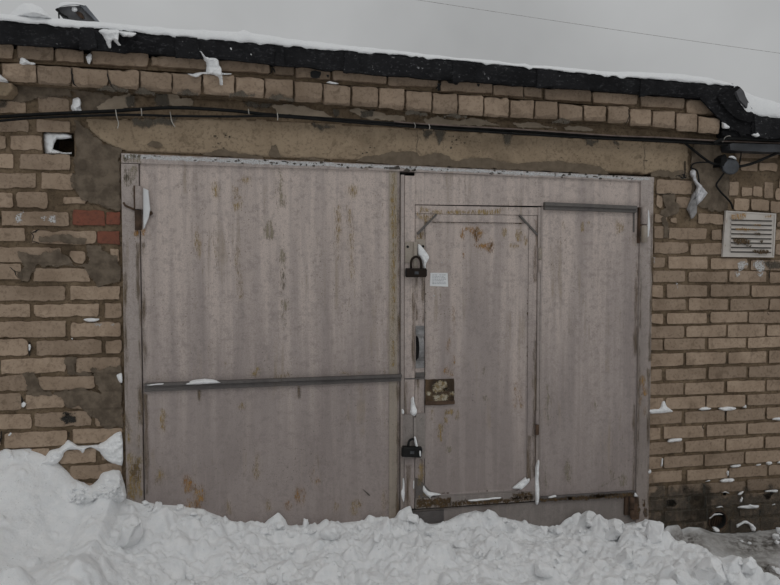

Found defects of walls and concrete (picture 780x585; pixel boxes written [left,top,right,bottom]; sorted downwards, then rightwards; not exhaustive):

peeling [163,89,198,106]
peeling [269,94,332,117]
peeling [349,108,405,121]
peeling [424,114,499,126]
peeling [513,122,593,131]
spalling [119,133,689,189]
corrosion [407,470,648,518]
damp [649,484,780,534]